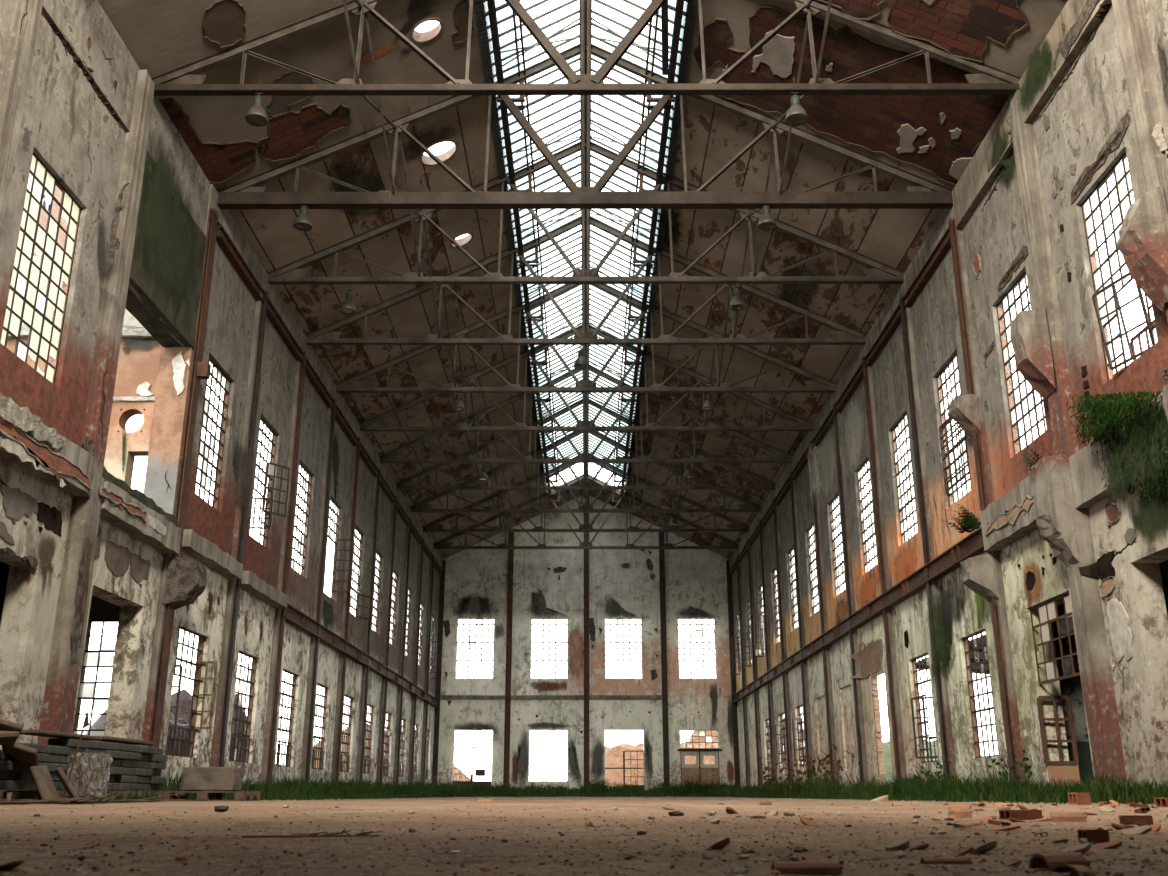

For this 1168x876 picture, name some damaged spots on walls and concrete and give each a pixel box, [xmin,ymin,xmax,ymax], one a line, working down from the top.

spalling [693,0,1029,185]
spalling [159,69,352,184]
flaking render [136,381,154,397]
spalling [0,421,166,536]
flaking render [0,484,62,569]
leakage [605,599,636,617]
leakage [680,607,711,617]
leakage [939,579,976,645]
spalling [849,639,883,679]